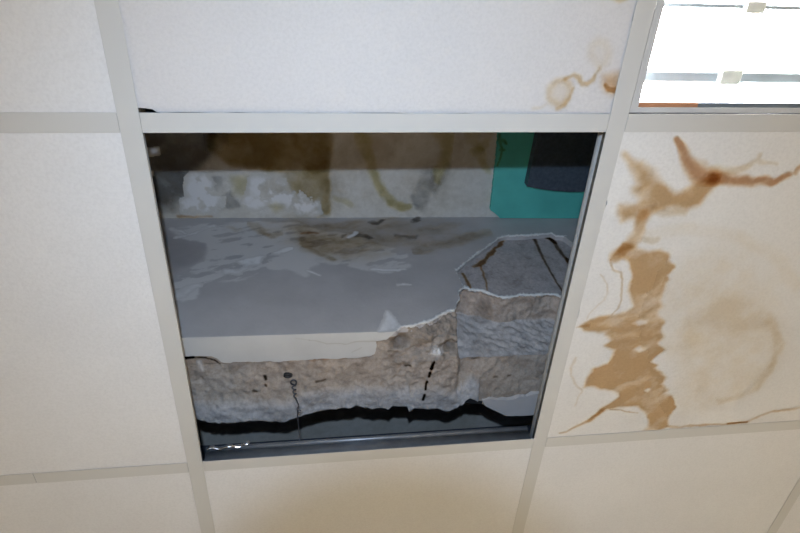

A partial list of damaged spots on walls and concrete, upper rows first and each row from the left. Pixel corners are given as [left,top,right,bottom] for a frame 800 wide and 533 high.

water stain [211,133,283,169]
peeling [144,133,416,306]
spalling [185,232,572,424]